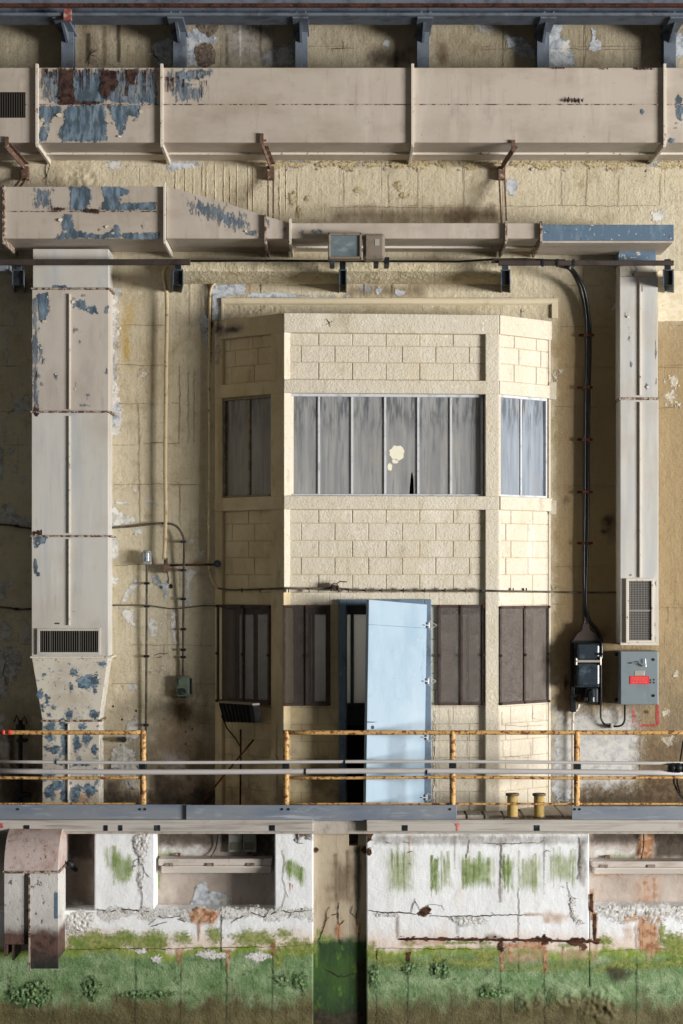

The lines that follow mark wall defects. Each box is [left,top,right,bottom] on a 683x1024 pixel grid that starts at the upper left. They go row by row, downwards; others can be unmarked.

rust [41,67,207,106]
peeling [39,25,219,144]
peeling [54,185,160,240]
peeling [69,661,108,693]
spalling [36,688,141,803]
water stain [409,835,517,857]
rust [638,834,654,858]
spalling [65,881,315,936]
rust [190,907,218,939]
crack [70,834,548,1024]
rust [400,889,602,971]
rust [623,914,660,957]